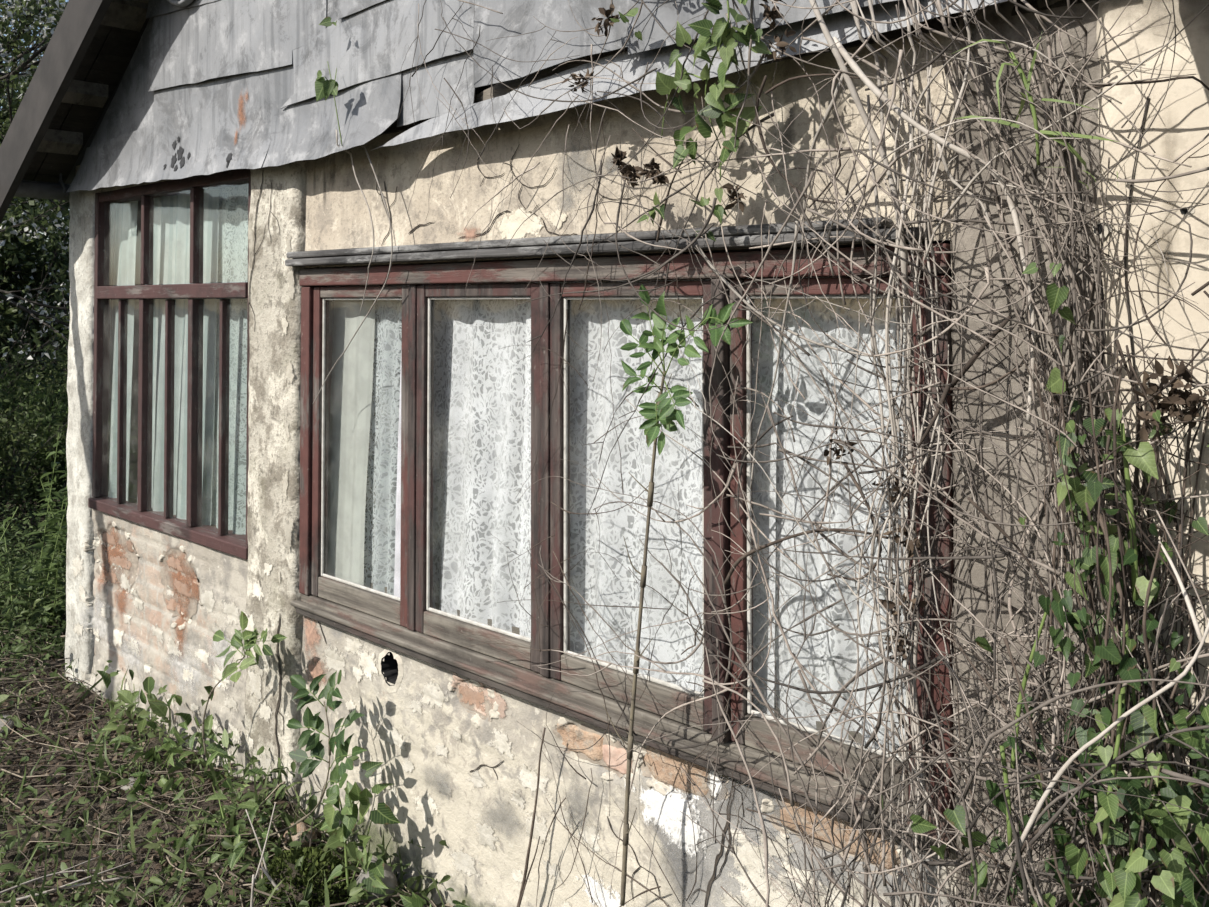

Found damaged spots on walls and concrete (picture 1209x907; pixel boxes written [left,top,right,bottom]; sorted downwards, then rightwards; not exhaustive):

peeling [281,234,295,336]
peeling [284,361,300,386]
peeling [283,517,296,553]
peeling [252,563,281,601]
spalling [72,521,274,779]
peeling [345,700,414,773]
peeling [359,755,452,822]
peeling [409,672,601,854]
spalling [553,717,730,858]
peeling [511,868,529,883]
peeling [542,859,621,907]